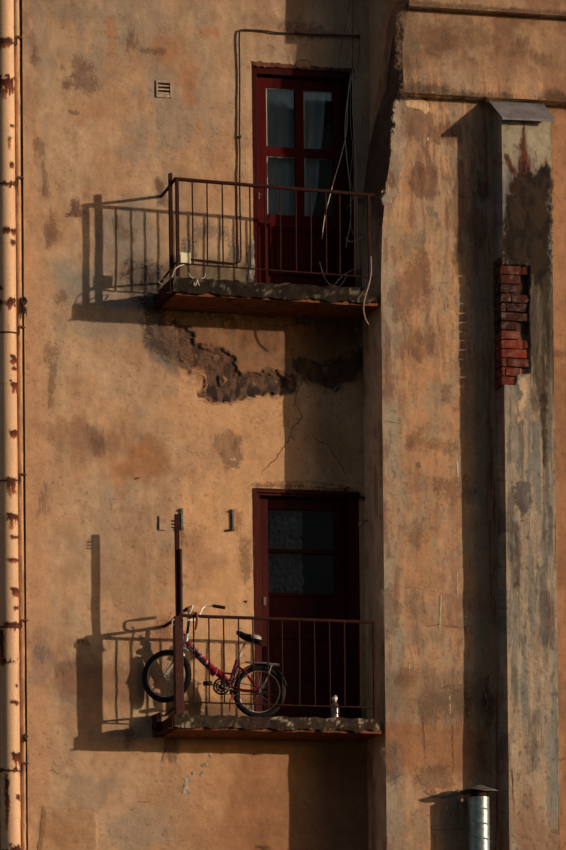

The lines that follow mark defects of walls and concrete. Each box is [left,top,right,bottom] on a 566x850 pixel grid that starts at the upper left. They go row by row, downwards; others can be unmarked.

flaking render [246,239,255,280]
flaking render [160,320,296,405]
peeling [382,252,435,406]
flaking render [493,257,530,390]
crack [259,369,346,477]
damp [539,591,556,647]